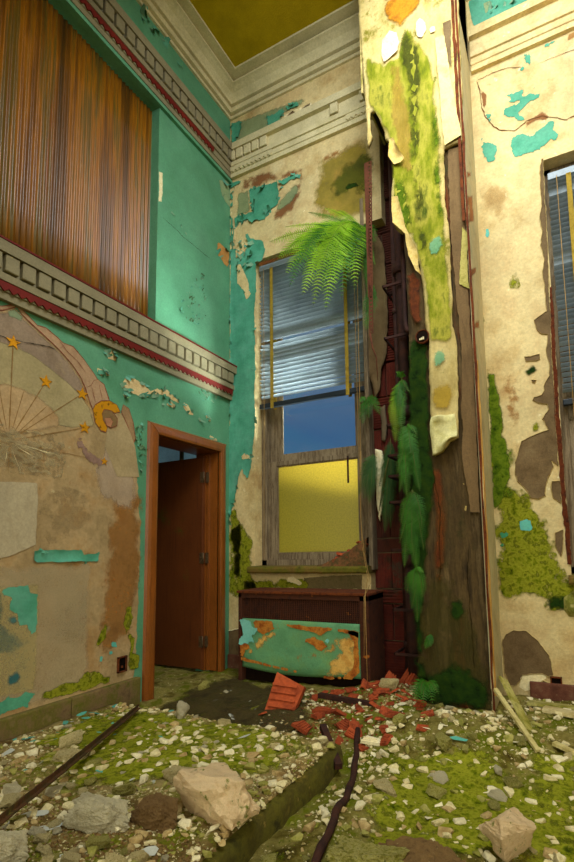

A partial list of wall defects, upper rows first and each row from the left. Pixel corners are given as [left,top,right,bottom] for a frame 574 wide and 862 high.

peeling [266,102,311,125]
peeling [504,87,539,120]
spalling [388,137,404,164]
peeling [481,138,497,162]
water stain [315,144,371,217]
spalling [391,196,421,274]
spalling [510,121,562,504]
peeling [198,173,301,525]
peeling [120,375,211,423]
peeling [0,308,147,718]
spalling [554,529,564,557]
spalling [501,629,561,687]